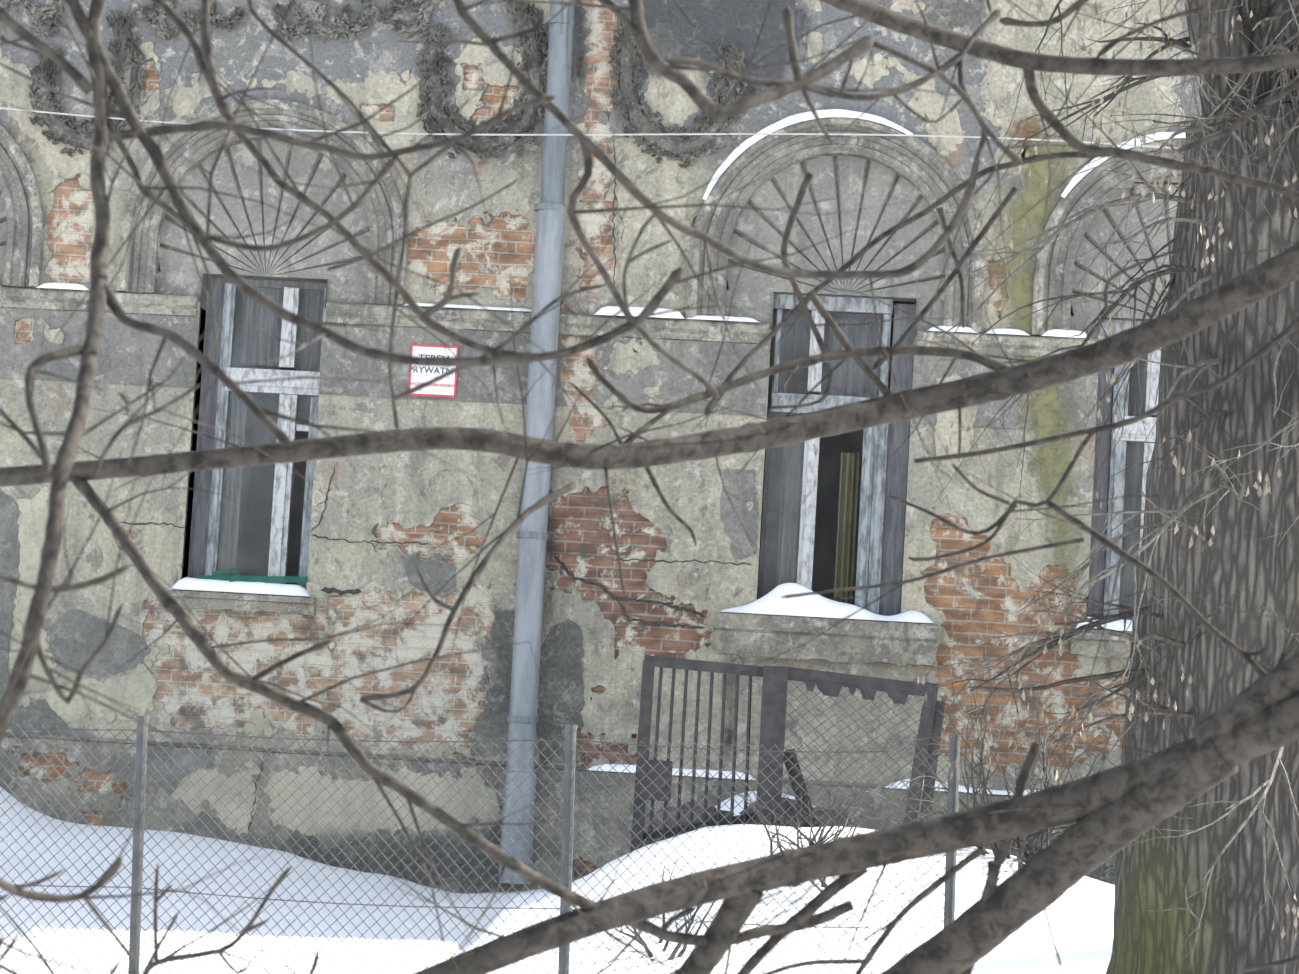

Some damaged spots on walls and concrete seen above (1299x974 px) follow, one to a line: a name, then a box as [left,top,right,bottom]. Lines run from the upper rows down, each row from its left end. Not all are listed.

flaking render [452,0,550,127]
flaking render [0,48,94,291]
flaking render [407,209,536,302]
flaking render [560,300,576,314]
flaking render [561,335,744,444]
flaking render [13,485,50,653]
crack [321,587,361,595]
crack [311,466,429,553]
flaking render [366,503,485,563]
flaking render [545,453,763,771]
flaking render [784,507,1127,777]
flaking render [3,576,502,852]